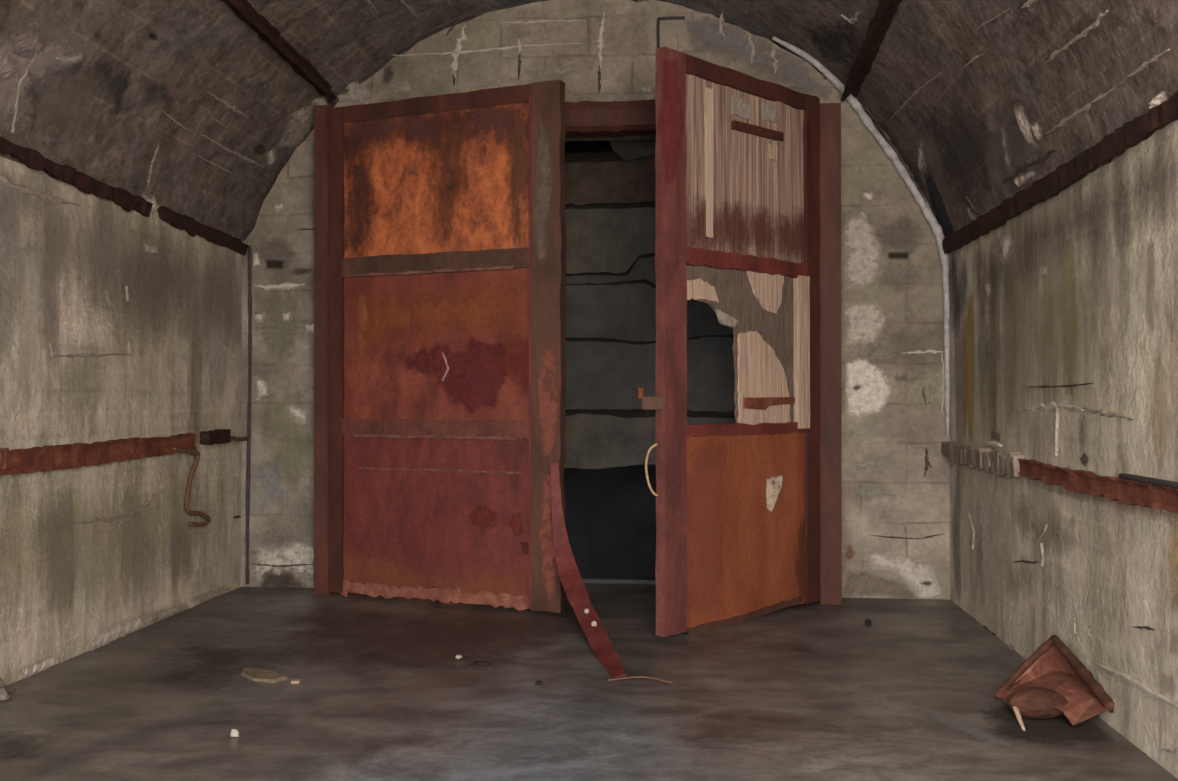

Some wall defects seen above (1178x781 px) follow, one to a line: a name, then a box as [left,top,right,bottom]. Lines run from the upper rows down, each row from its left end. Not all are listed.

leakage [46,211,234,397]
rust [344,138,374,252]
rust [431,113,469,240]
rust [508,120,553,262]
flaking render [846,218,914,284]
flaking render [846,305,944,415]
leakage [950,146,1176,430]
spalling [255,542,314,588]
leakage [954,472,996,594]